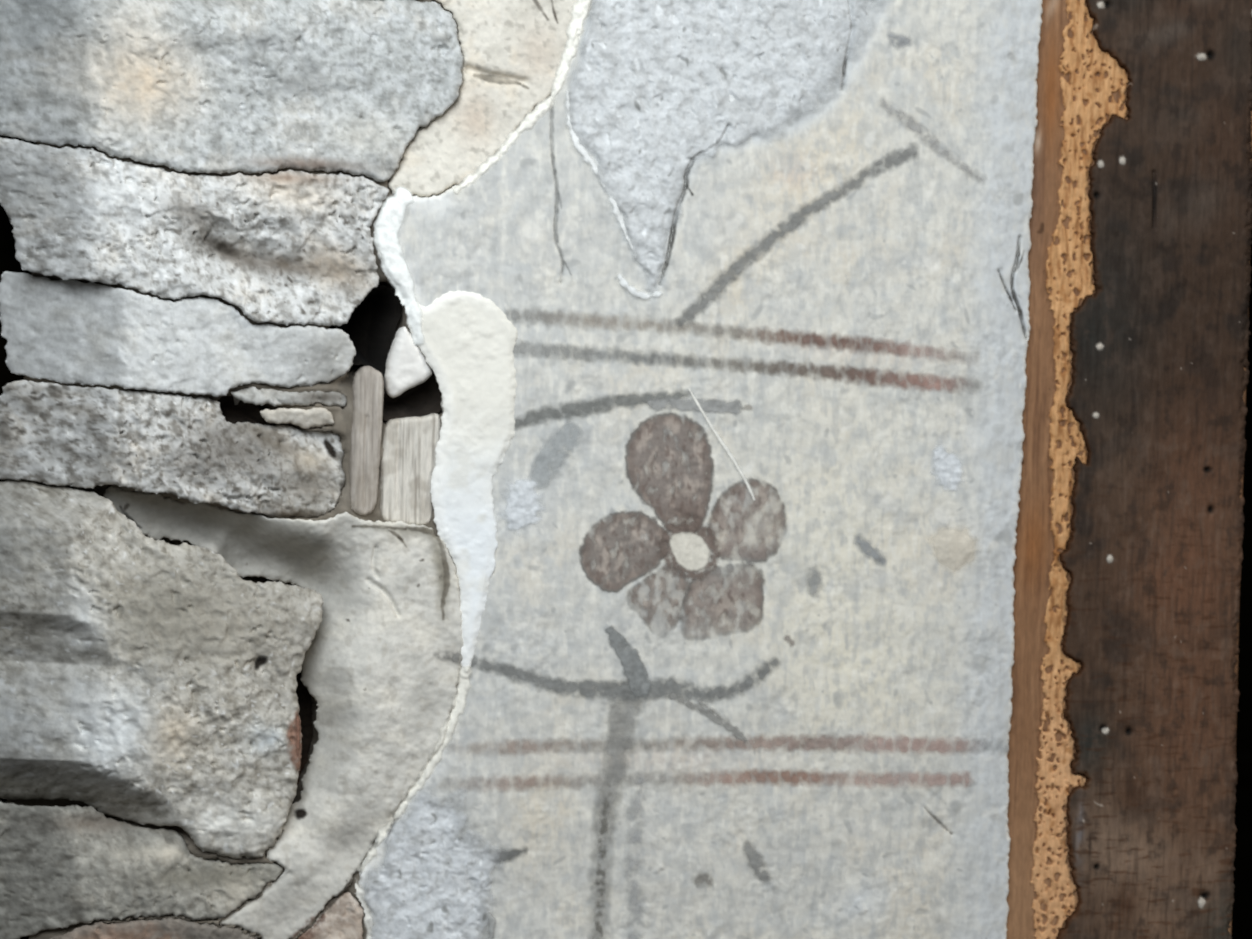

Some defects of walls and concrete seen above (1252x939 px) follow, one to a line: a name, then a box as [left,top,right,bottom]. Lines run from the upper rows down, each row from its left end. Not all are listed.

spalling [454,0,871,299]
crack [551,153,564,270]
crack [662,159,695,274]
crack [998,247,1025,332]
spalling [355,667,499,939]